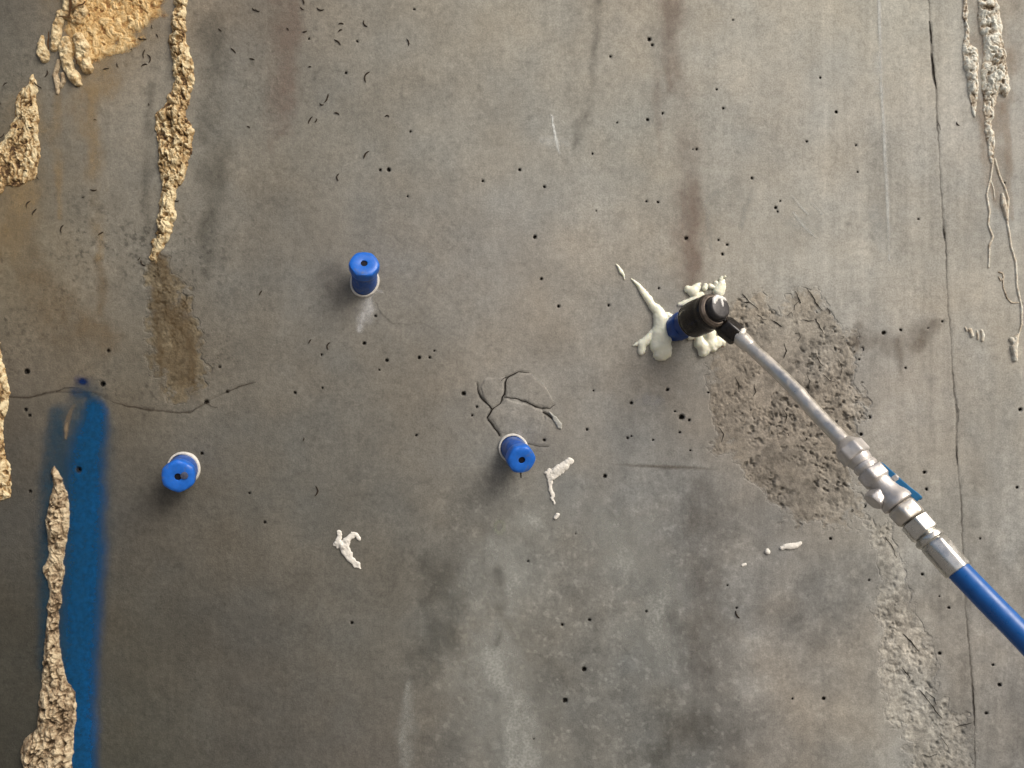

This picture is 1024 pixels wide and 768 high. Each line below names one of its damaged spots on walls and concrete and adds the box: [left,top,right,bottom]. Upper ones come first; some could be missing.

crack [929,2,941,141]
crack [477,371,562,447]
spalling [728,284,872,437]
spalling [703,333,985,768]
crack [967,626,976,763]